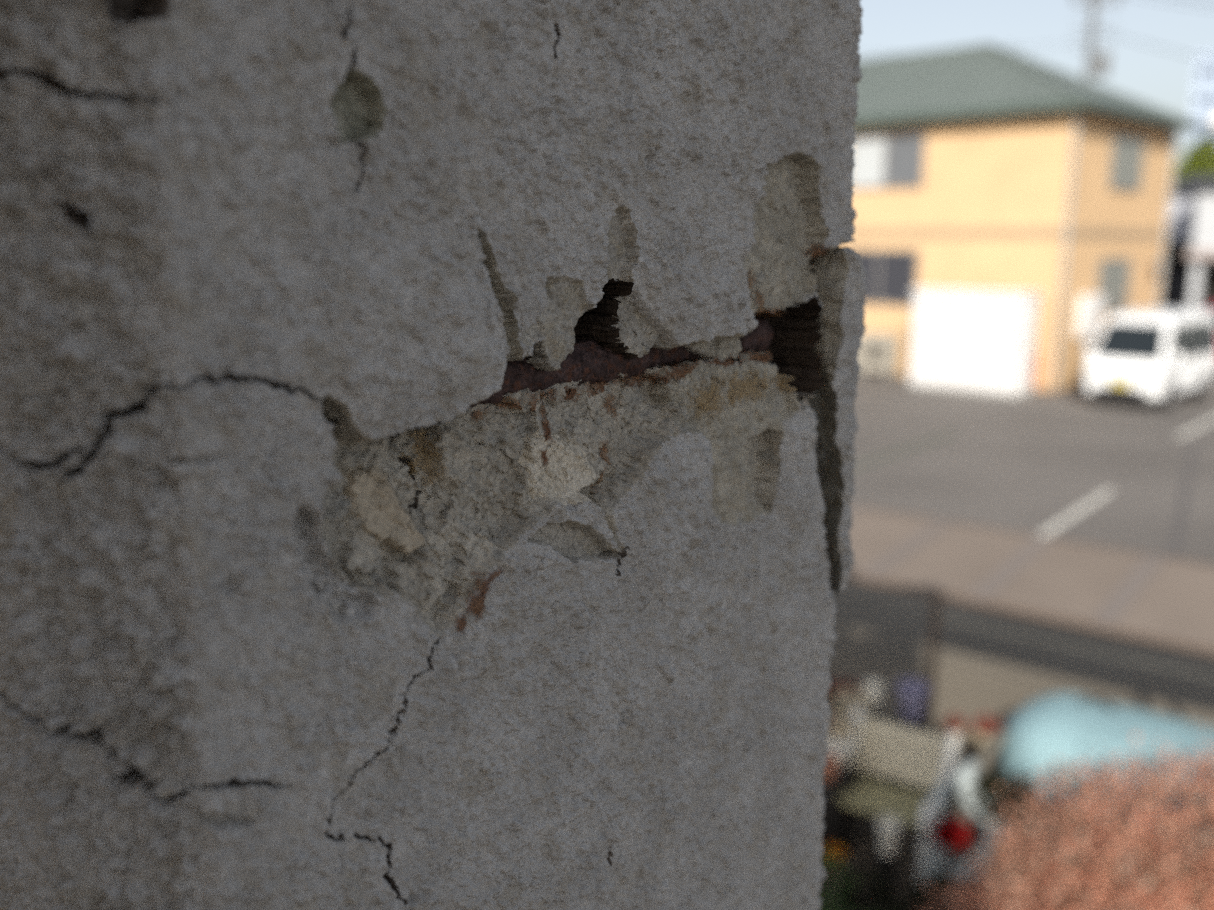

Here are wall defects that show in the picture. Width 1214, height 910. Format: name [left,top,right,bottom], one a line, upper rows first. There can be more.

crack [0,66,159,104]
crack [552,24,561,60]
crack [17,372,321,477]
spalling [292,151,855,636]
rust [468,318,773,409]